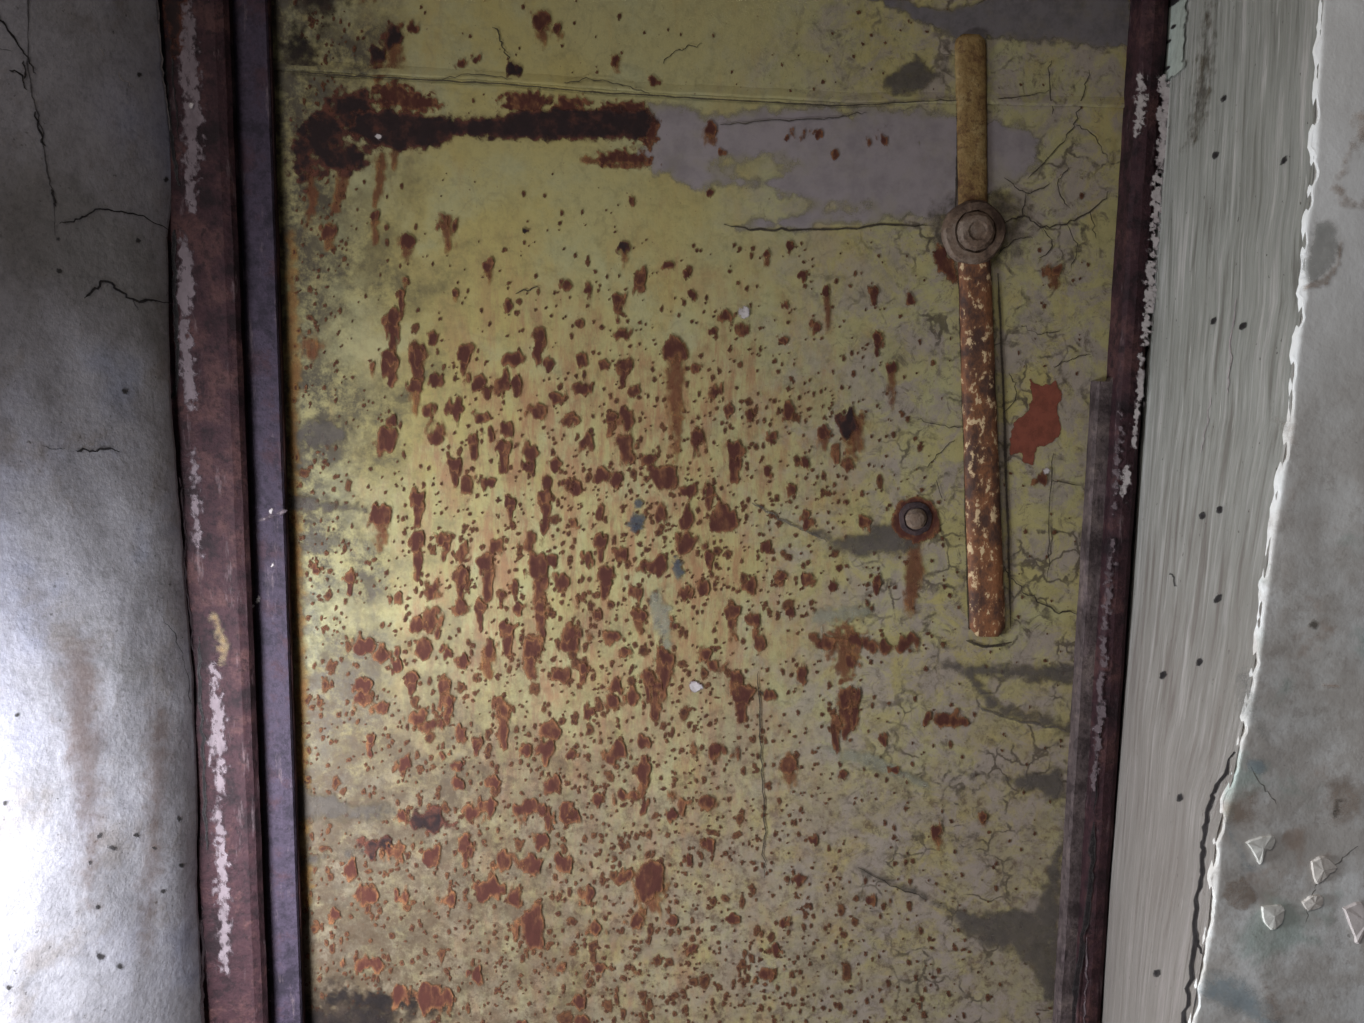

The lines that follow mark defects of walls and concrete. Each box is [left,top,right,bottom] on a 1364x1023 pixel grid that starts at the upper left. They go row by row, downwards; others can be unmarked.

rust [162,0,187,60]
crack [0,0,180,399]
peeling [637,102,958,234]
peeling [987,120,1041,194]
rust [1037,248,1090,290]
peeling [1111,73,1170,515]
peeling [1303,223,1341,288]
peeling [1009,379,1062,474]
rust [284,0,976,1023]
peeling [1246,835,1275,864]
peeling [1261,904,1285,930]
peeling [1301,856,1337,911]